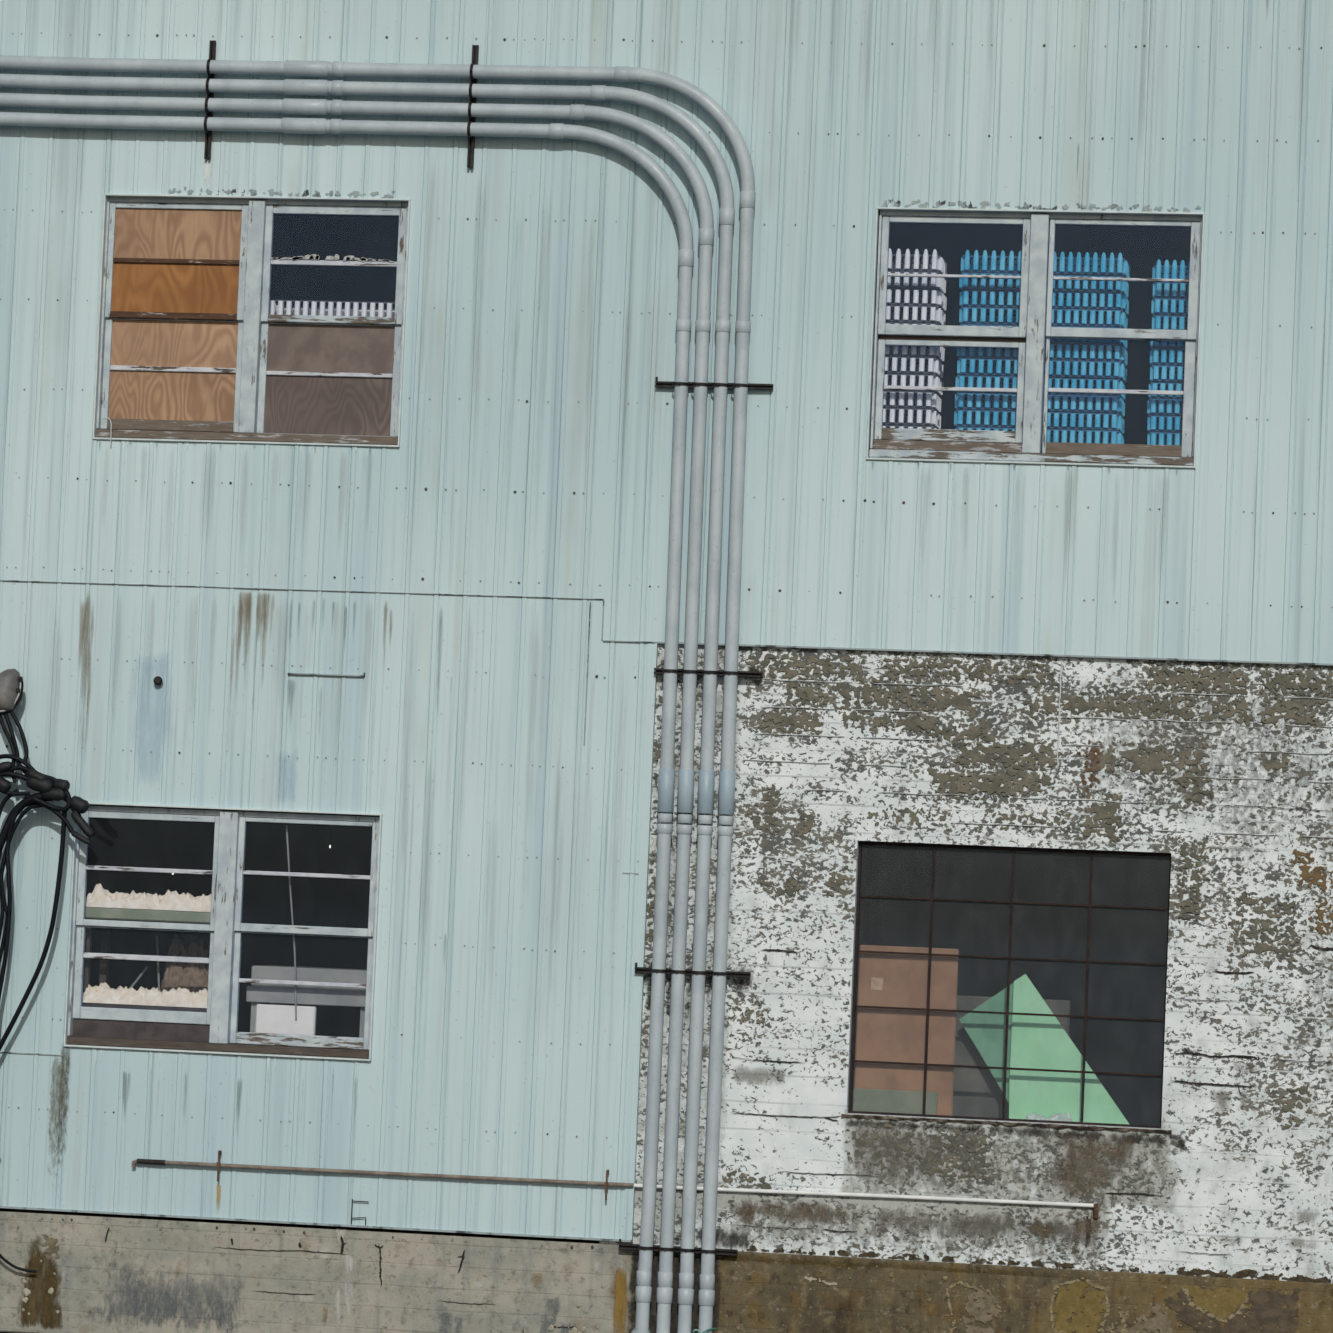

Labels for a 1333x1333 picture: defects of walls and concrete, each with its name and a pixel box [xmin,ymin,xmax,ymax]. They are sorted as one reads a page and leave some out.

peeling [744,649,1333,846]
peeling [822,866,853,898]
peeling [1172,835,1213,924]
peeling [1226,891,1305,970]
peeling [728,998,772,1027]
leakage [49,1048,70,1151]
peeling [1267,1083,1313,1130]
peeling [722,1171,771,1194]
peeling [845,1123,996,1184]
leakage [848,1119,1185,1194]
leakage [1049,1272,1148,1333]
leakage [1166,1285,1250,1333]